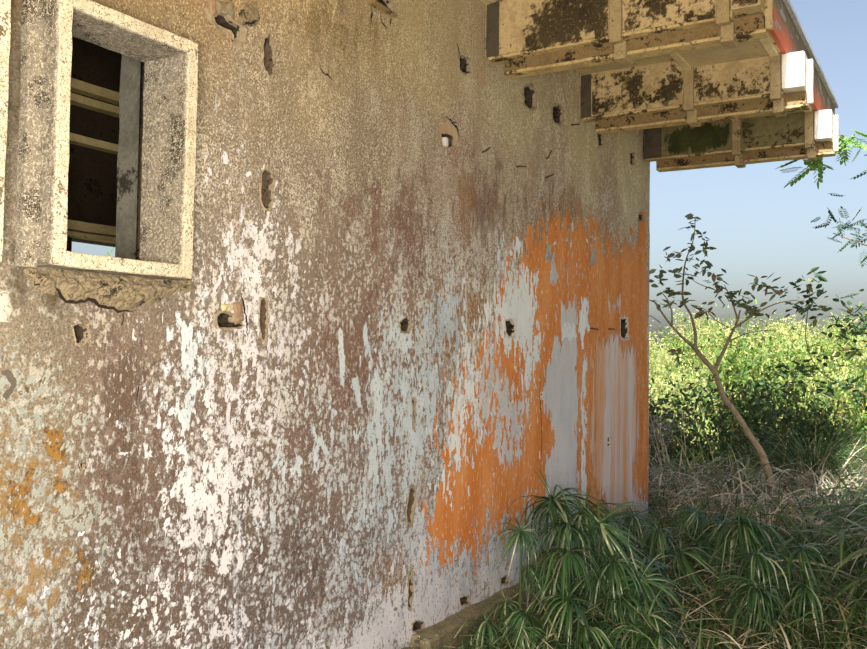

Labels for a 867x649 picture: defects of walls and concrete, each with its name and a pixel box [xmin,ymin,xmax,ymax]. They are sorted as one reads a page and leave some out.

flaking render [204,0,260,50]
damp [522,0,608,50]
damp [628,0,715,29]
damp [732,0,758,8]
damp [591,69,682,115]
damp [696,66,769,101]
damp [664,123,729,155]
spalling [23,268,198,314]
flaking render [192,301,246,382]
flaking render [1,370,17,400]
peeling [352,375,366,412]
peeling [363,194,650,633]